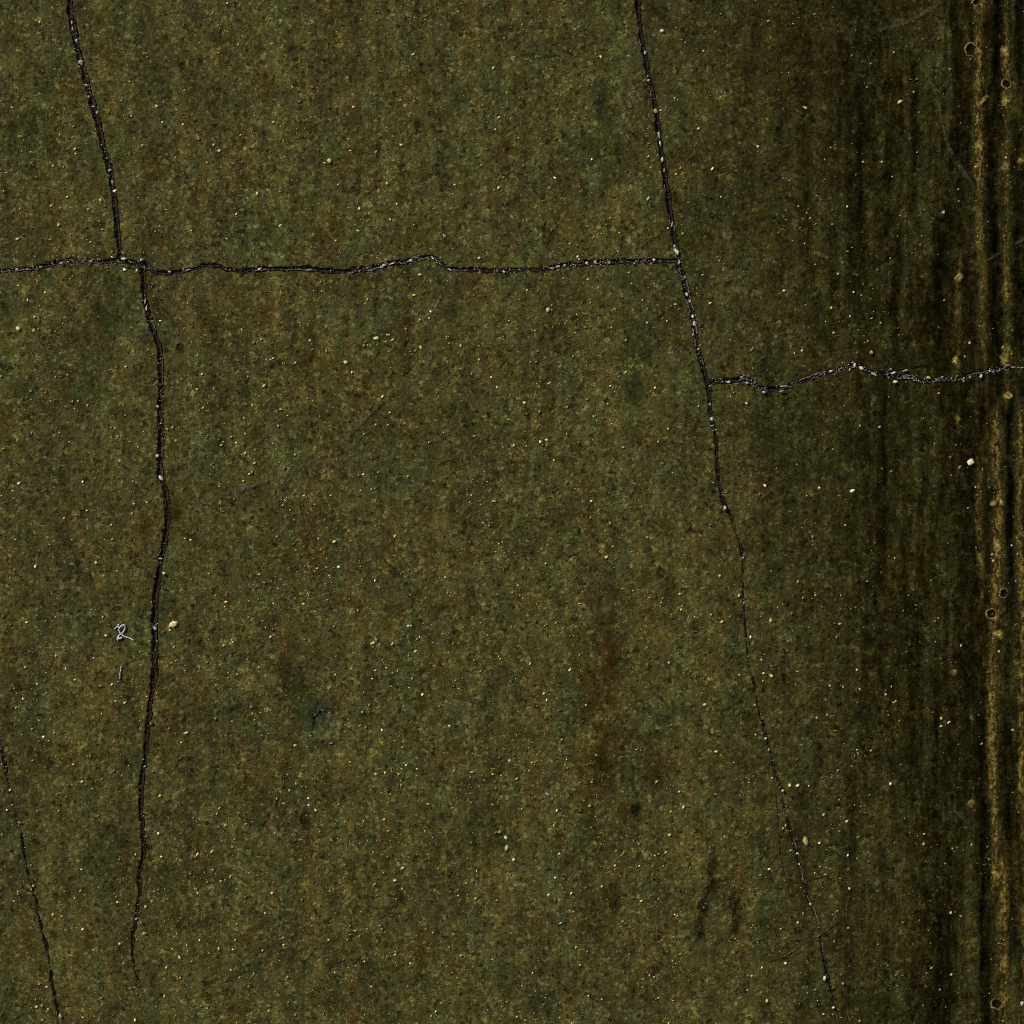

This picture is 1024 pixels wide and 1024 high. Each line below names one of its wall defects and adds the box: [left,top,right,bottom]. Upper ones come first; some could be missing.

crack [522,0,1024,530]
crack [0,0,520,858]
crack [742,582,750,666]
water stain [814,0,1024,1024]
crack [0,745,61,1018]
crack [130,862,144,966]
crack [760,719,850,1021]